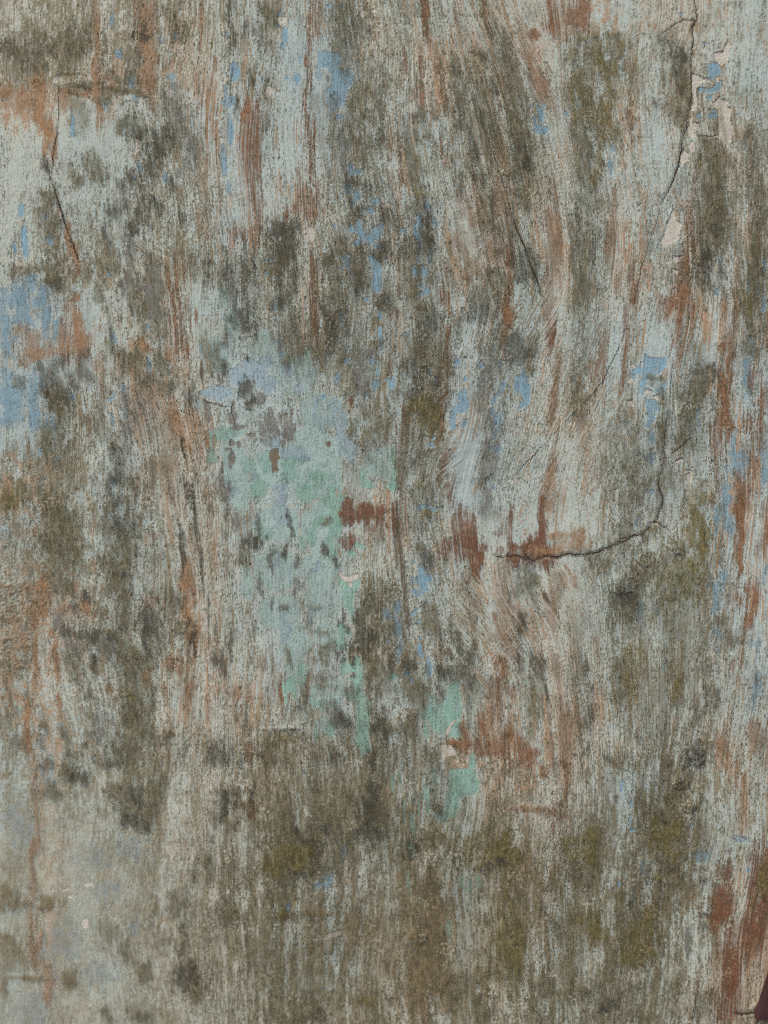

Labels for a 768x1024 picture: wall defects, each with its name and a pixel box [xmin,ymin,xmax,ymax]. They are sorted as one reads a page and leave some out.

crack [40,85,79,262]
crack [513,0,698,477]
spalling [680,40,733,165]
crack [496,376,672,574]